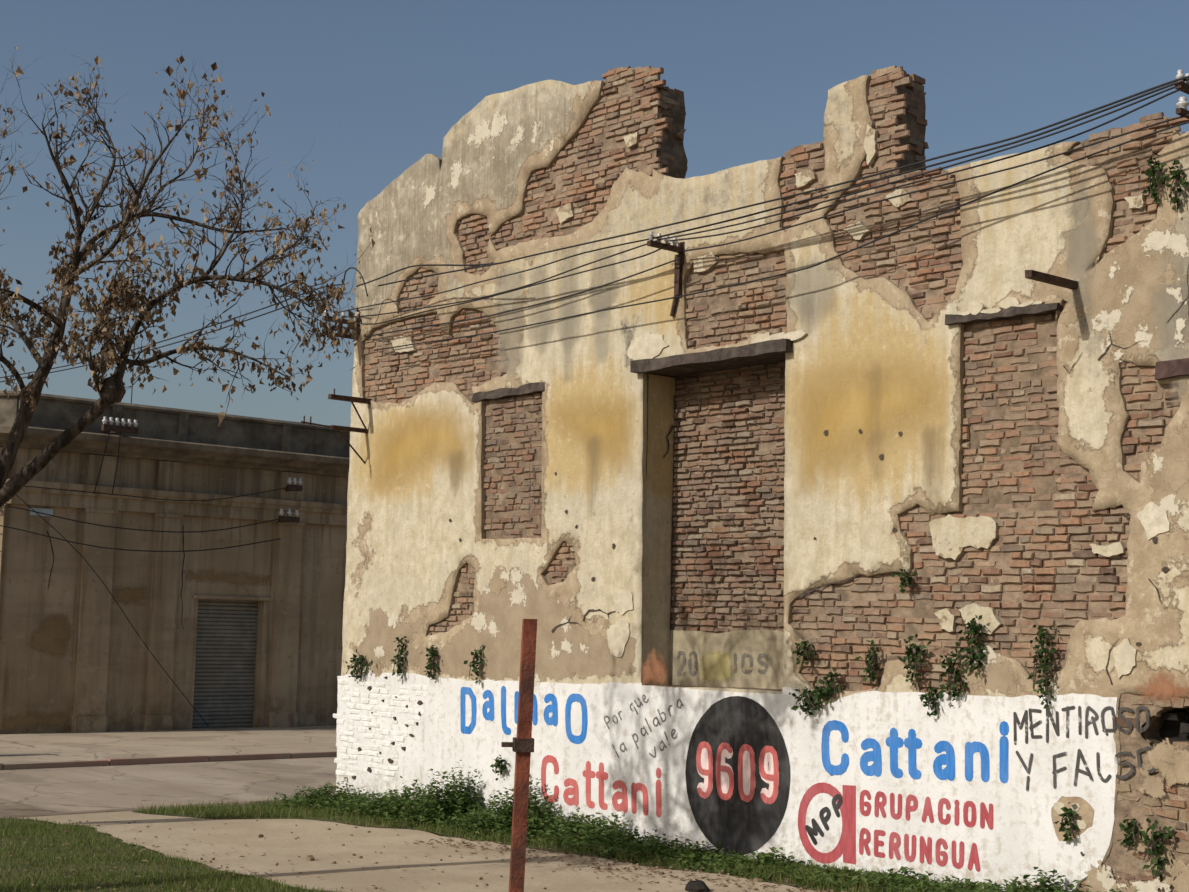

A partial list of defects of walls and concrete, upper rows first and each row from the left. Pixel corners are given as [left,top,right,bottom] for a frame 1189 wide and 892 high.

spalling [456,66,688,275]
spalling [780,66,963,321]
spalling [363,268,509,404]
flaking render [1059,112,1189,516]
water stain [379,416,463,480]
water stain [806,376,926,474]
flaking render [356,542,637,691]
crack [798,576,857,599]
spalling [791,369,1131,696]
spalling [379,696,423,763]
peeling [1052,796,1094,841]
spalling [1078,693,1189,892]